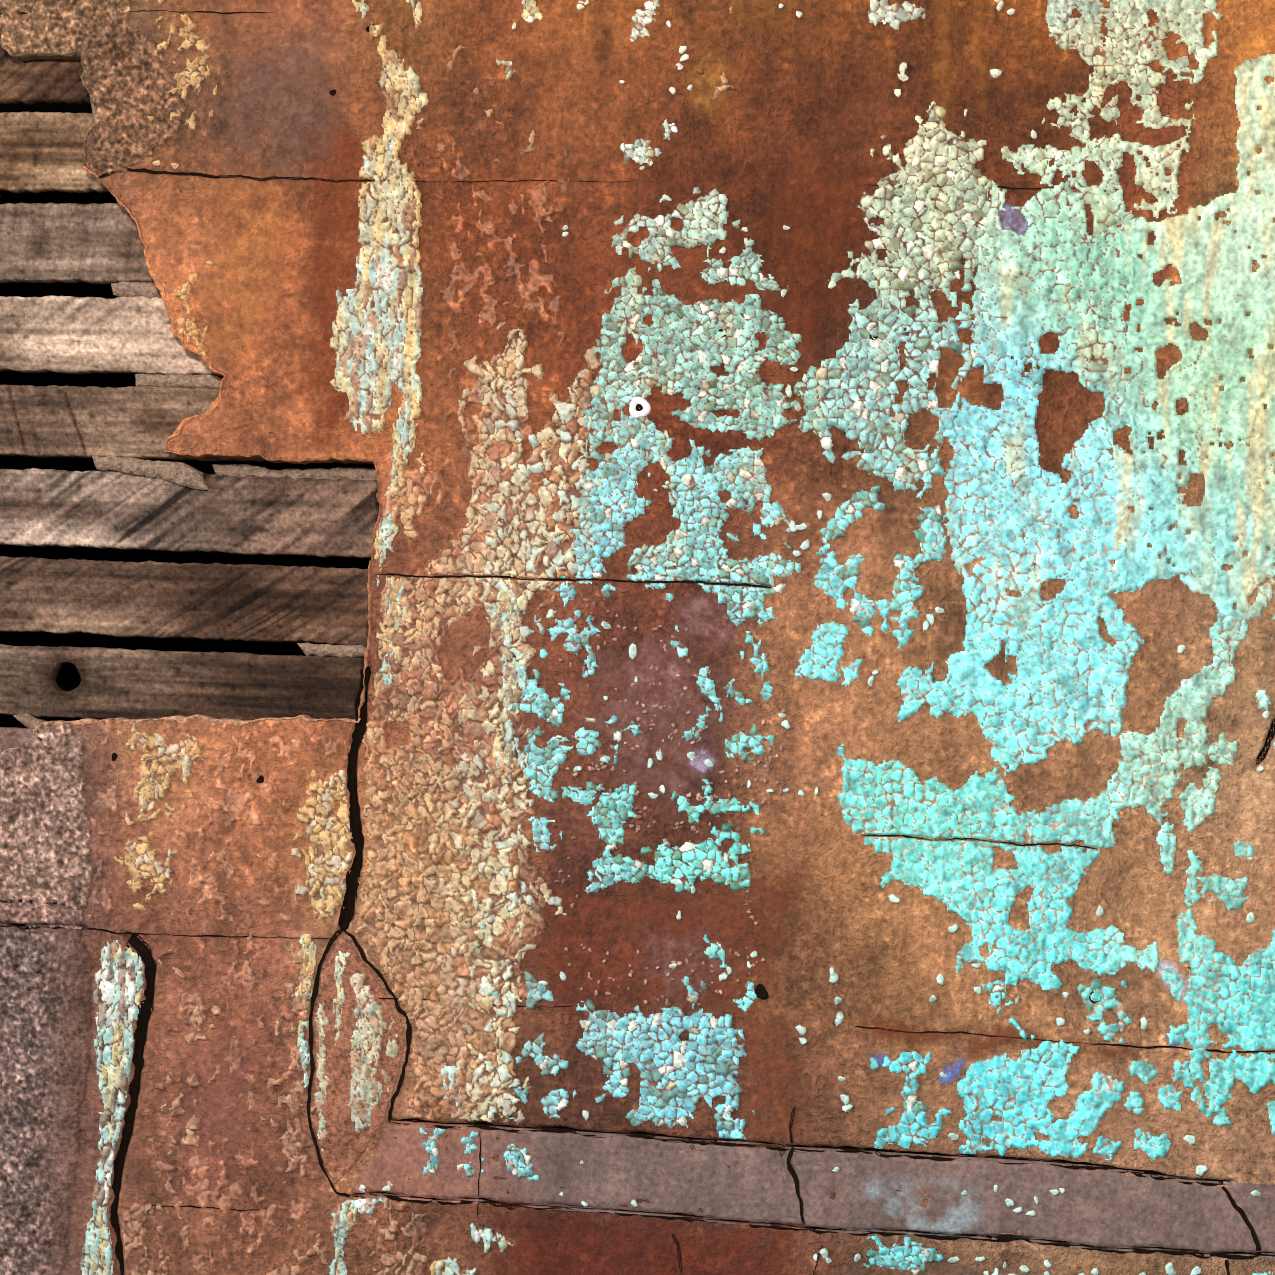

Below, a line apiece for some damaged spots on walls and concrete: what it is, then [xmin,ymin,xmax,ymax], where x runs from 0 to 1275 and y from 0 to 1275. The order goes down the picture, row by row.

corrosion [213,182,282,361]
corrosion [300,128,362,445]
flaking render [0,0,476,1275]
peeling [355,0,1275,1140]
peeling [470,1223,515,1253]
peeling [504,1144,539,1181]
crack [0,666,1275,1275]
corrosion [874,1019,1015,1057]
peeling [854,1235,1052,1275]
peeling [869,1017,1158,1160]
peeling [994,1184,1065,1216]
peeling [1134,1128,1196,1160]